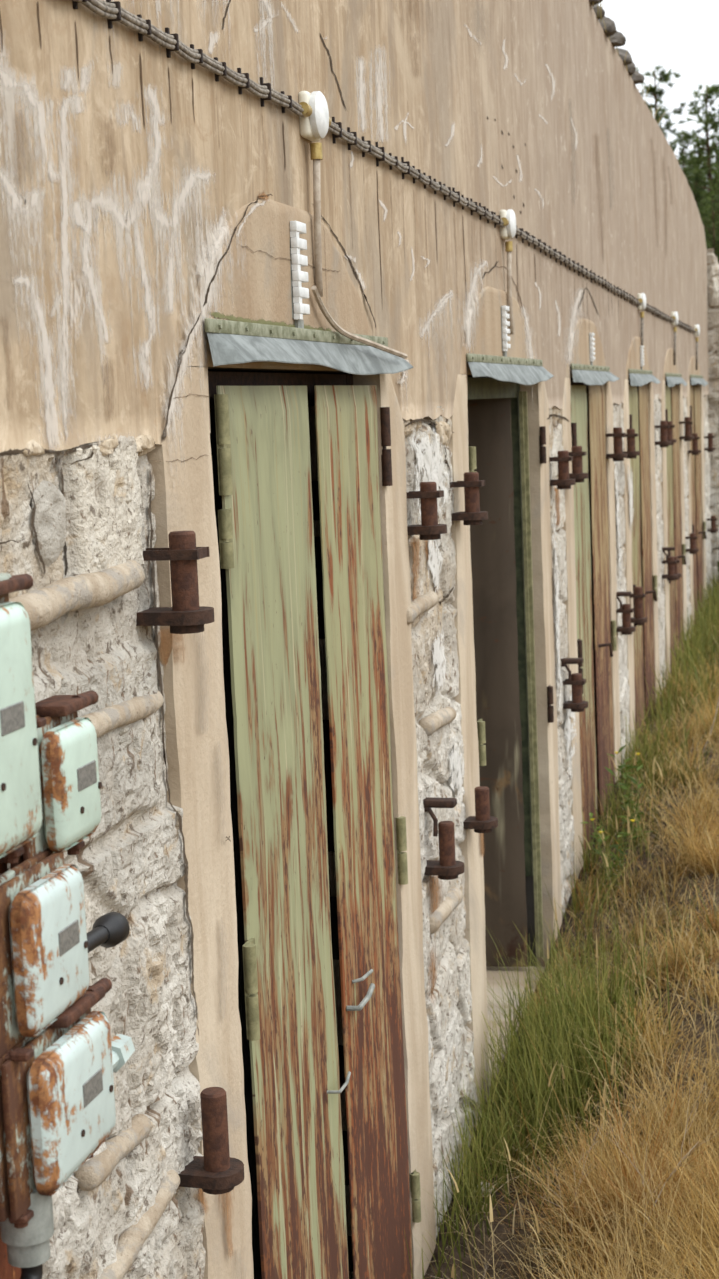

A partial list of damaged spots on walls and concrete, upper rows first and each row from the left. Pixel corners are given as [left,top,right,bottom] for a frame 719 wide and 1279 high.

crack [209,0,231,54]
crack [320,34,346,108]
leakage [356,48,388,140]
leakage [0,14,231,447]
leakage [419,227,488,346]
leakage [516,244,534,359]
leakage [567,288,590,362]
spalling [0,433,119,456]
spalling [405,418,454,447]
peeling [428,539,443,592]
crack [148,196,376,1035]
peeling [449,738,464,800]